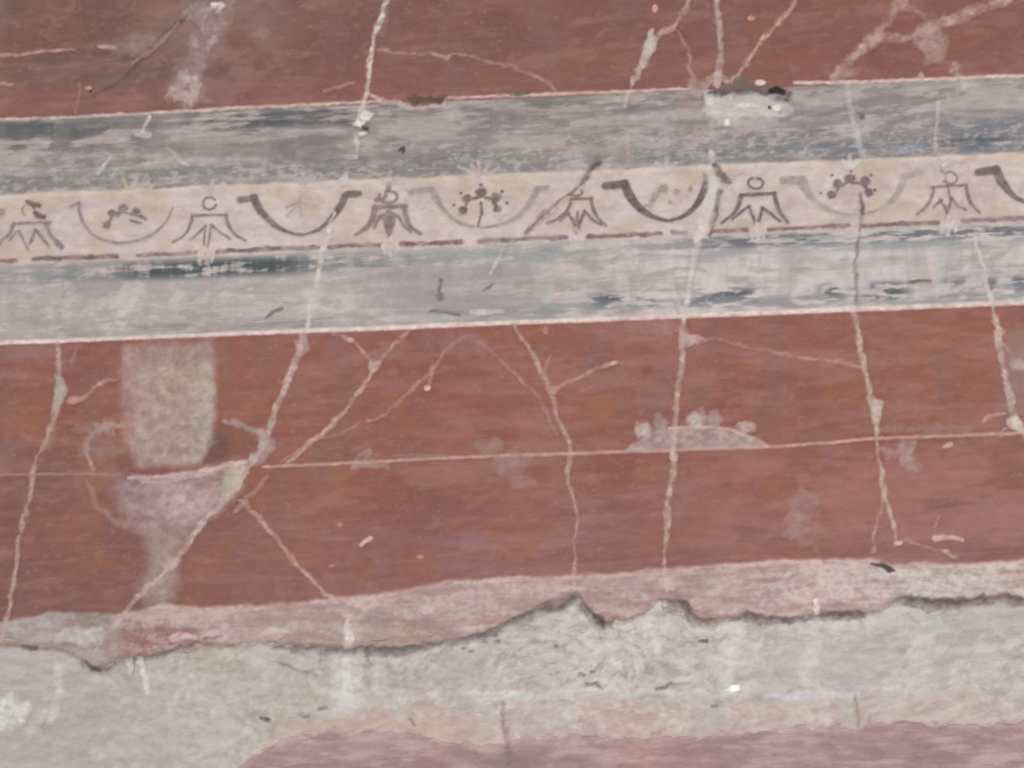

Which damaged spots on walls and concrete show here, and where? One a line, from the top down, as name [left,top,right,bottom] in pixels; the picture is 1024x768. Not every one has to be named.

crack [72,19,186,116]
crack [343,0,558,160]
crack [522,158,604,237]
flaking render [695,74,796,133]
crack [621,0,1024,632]
crack [0,271,120,644]
crack [77,207,625,677]
flaking render [0,555,1024,768]